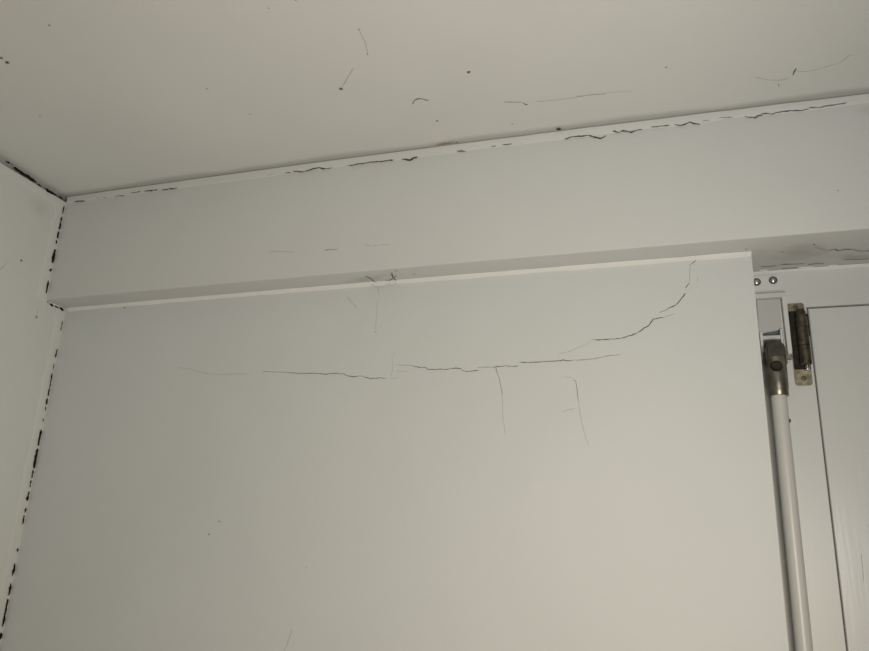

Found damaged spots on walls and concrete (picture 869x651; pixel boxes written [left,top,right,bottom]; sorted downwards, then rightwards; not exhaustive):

crack [287,157,417,173]
crack [566,103,845,139]
crack [6,161,176,524]
crack [262,261,698,446]
crack [0,549,19,639]